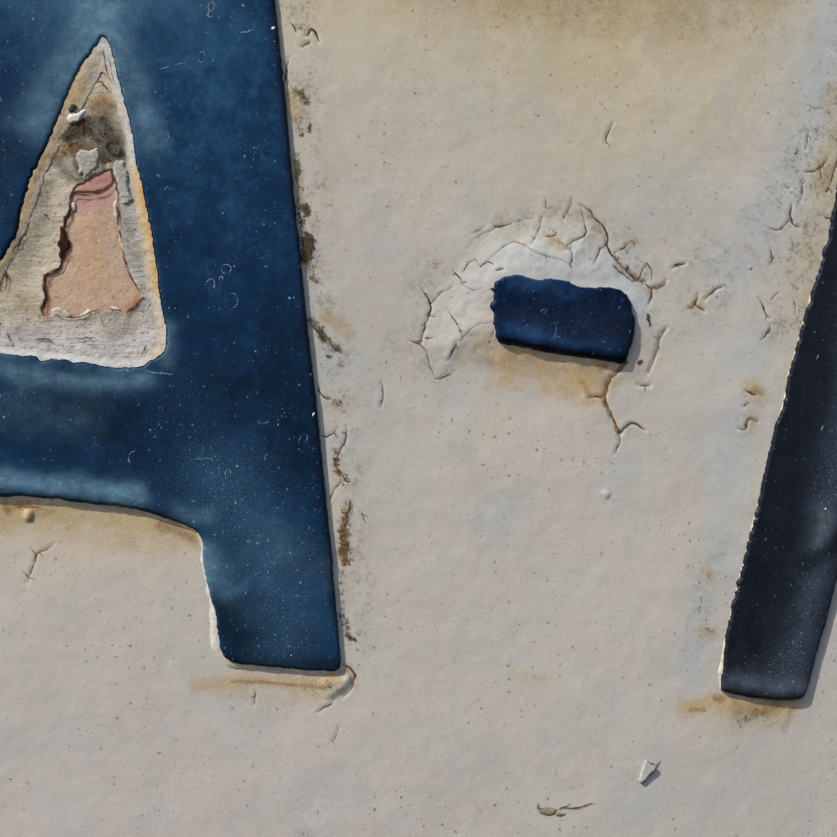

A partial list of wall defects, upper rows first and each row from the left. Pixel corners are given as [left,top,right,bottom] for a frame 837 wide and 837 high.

peeling [0,37,166,368]
crack [770,159,837,266]
crack [410,198,685,379]
crack [760,284,798,339]
corrosion [489,345,610,399]
crack [639,329,666,390]
crack [592,361,643,449]
crack [739,391,756,430]
corrosion [678,695,799,728]
peeling [536,803,592,817]